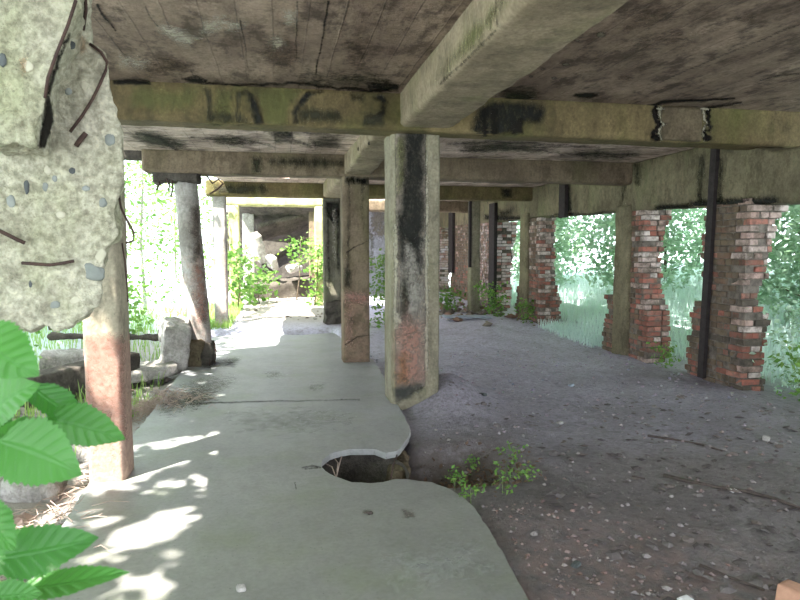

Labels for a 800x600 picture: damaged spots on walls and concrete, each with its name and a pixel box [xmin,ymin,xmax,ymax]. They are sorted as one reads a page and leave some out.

crack [38,34,71,148]
spalling [0,0,135,333]
leakage [131,131,193,151]
leakage [204,73,390,150]
leakage [398,133,425,272]
leakage [448,87,640,185]
spalling [386,450,411,481]